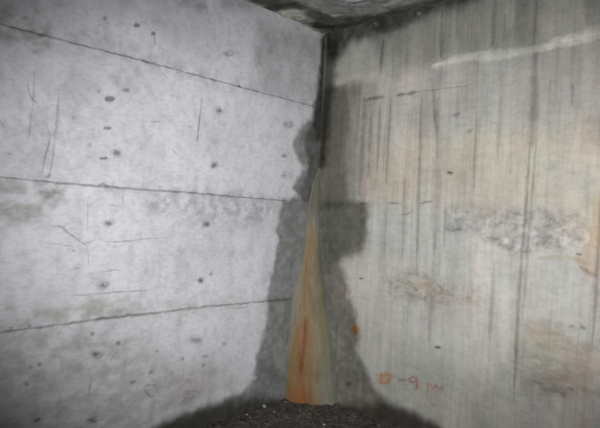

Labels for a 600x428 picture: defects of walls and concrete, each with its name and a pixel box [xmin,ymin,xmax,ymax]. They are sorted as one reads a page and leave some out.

corrosion [285,218,328,405]
leakage [143,0,518,428]